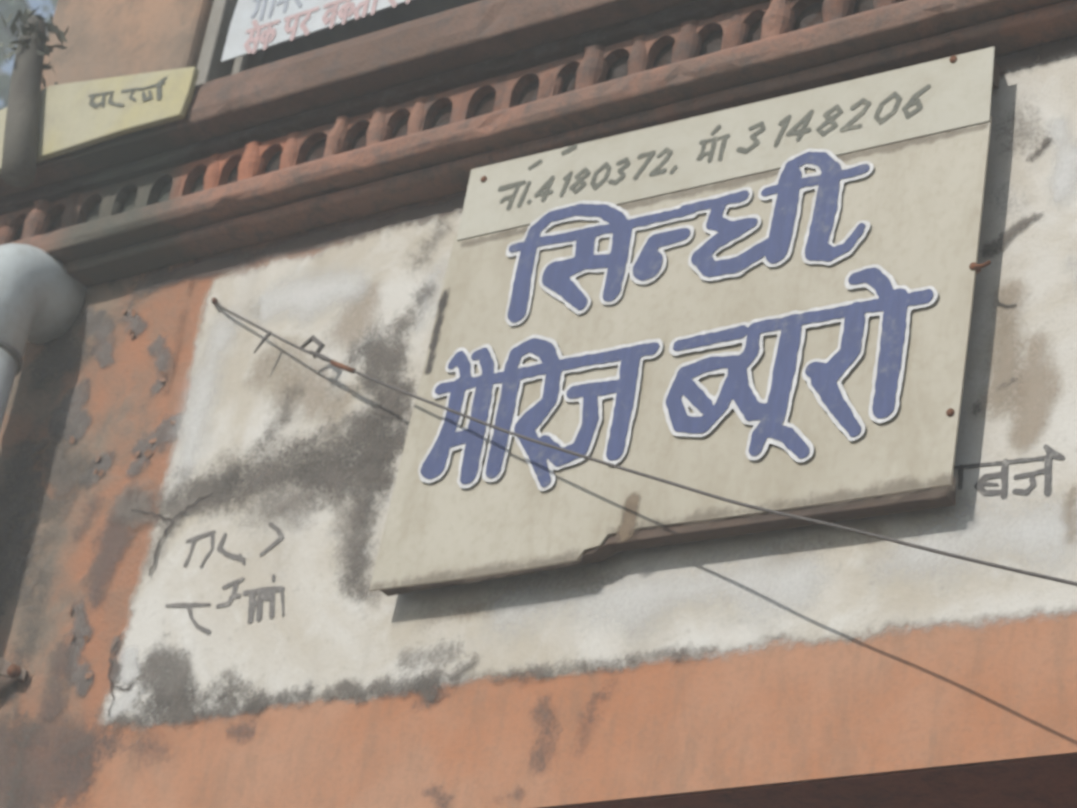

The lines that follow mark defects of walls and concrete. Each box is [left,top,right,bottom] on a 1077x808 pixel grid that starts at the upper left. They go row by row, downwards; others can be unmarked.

damp [1030,120,1077,200]
damp [983,213,1041,256]
damp [89,274,448,605]
crack [131,493,212,576]
damp [114,647,474,727]